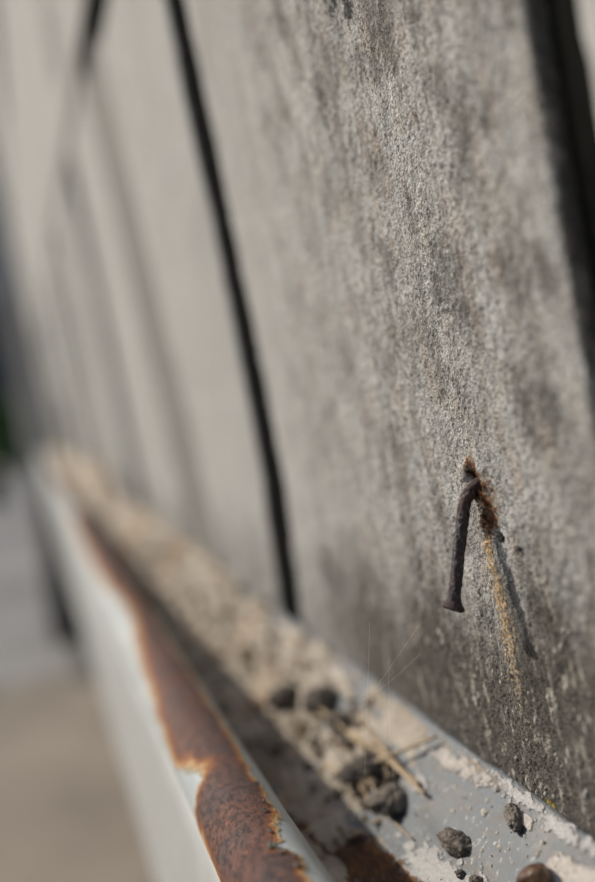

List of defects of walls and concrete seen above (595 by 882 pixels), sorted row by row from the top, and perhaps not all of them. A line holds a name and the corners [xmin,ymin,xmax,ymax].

rust [461,455,520,692]
rust [70,510,312,882]
rust [295,820,420,882]